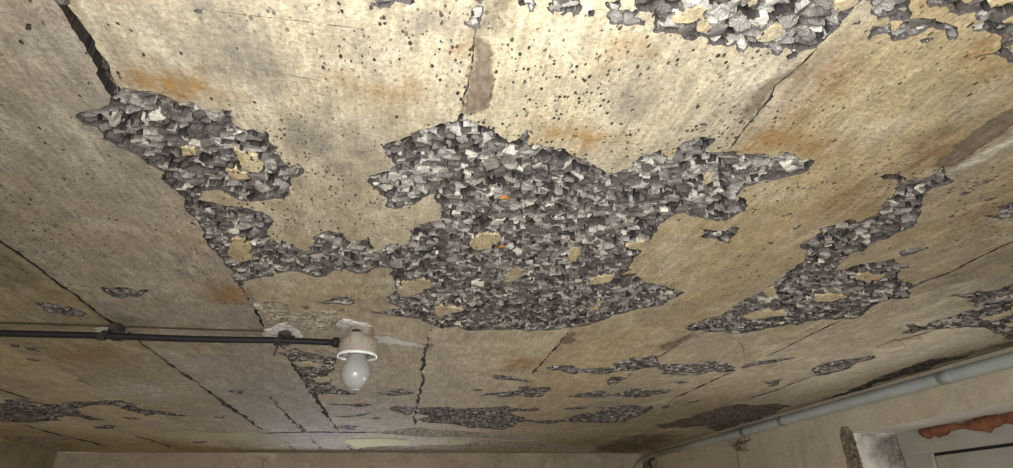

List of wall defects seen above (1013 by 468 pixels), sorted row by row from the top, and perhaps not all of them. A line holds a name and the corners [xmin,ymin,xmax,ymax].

spalling [370,0,416,9]
spalling [465,0,492,31]
spalling [518,0,1013,63]
spalling [75,85,815,332]
spalling [984,197,1013,220]
spalling [685,166,955,334]
spalling [36,303,86,317]
spalling [902,284,1013,340]
spalling [278,348,380,430]
spalling [331,355,797,453]